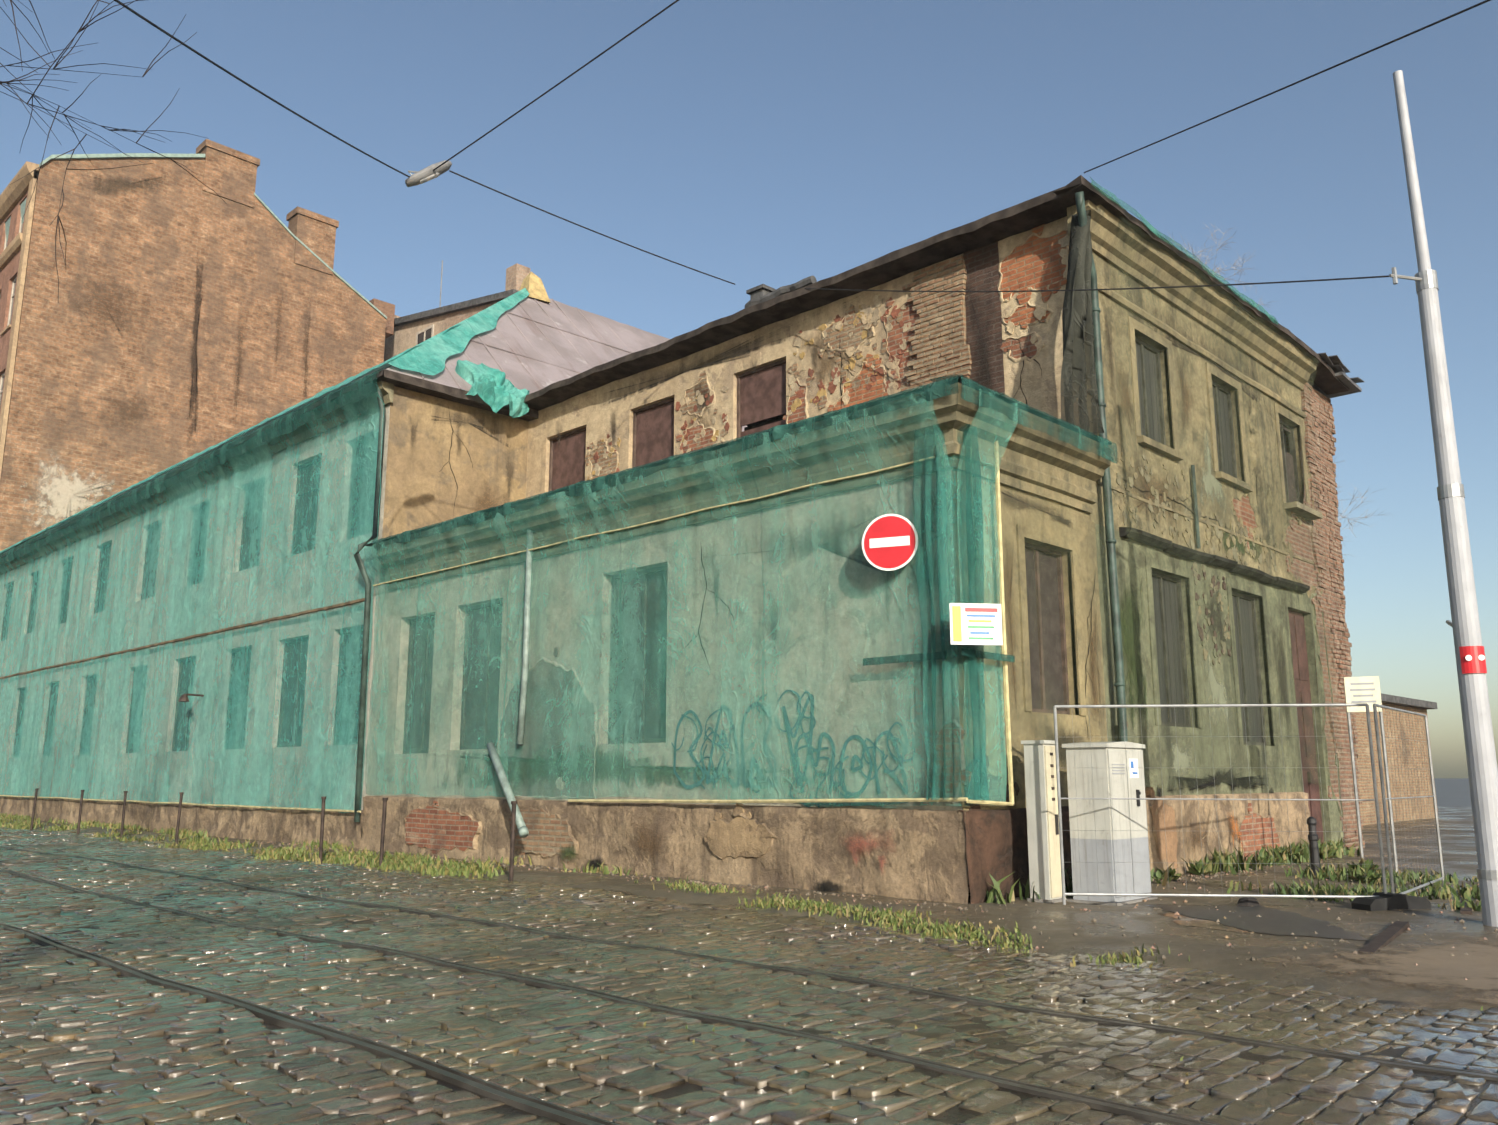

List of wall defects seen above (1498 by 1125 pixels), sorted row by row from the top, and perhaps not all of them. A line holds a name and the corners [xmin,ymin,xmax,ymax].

flaking render [997,224,1070,363]
flaking render [585,434,621,480]
flaking render [675,370,730,455]
flaking render [783,295,920,424]
flaking render [498,647,598,864]
spalling [404,801,482,856]